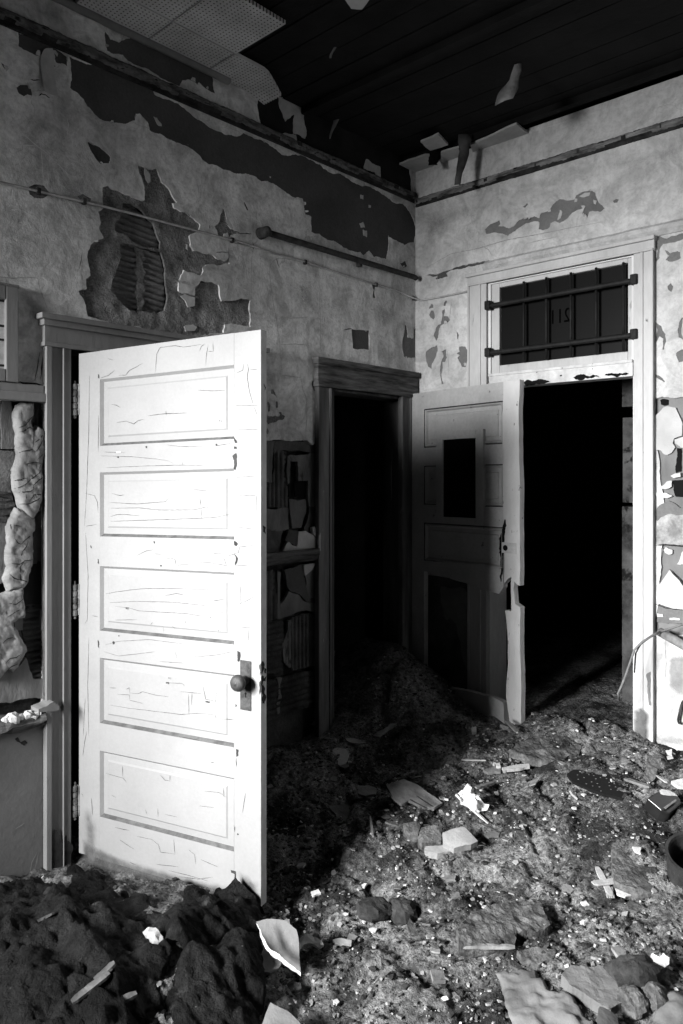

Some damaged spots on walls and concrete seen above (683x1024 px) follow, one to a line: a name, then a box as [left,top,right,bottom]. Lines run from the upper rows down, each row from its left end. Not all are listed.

spalling [78,166,252,336]
peeling [17,32,415,259]
peeling [485,189,619,236]
spalling [0,401,15,584]
spalling [28,402,42,429]
spalling [266,389,316,553]
peeling [352,329,370,350]
peeling [402,301,467,384]
spalling [655,397,683,635]
spalling [0,509,42,703]
spalling [259,563,315,721]